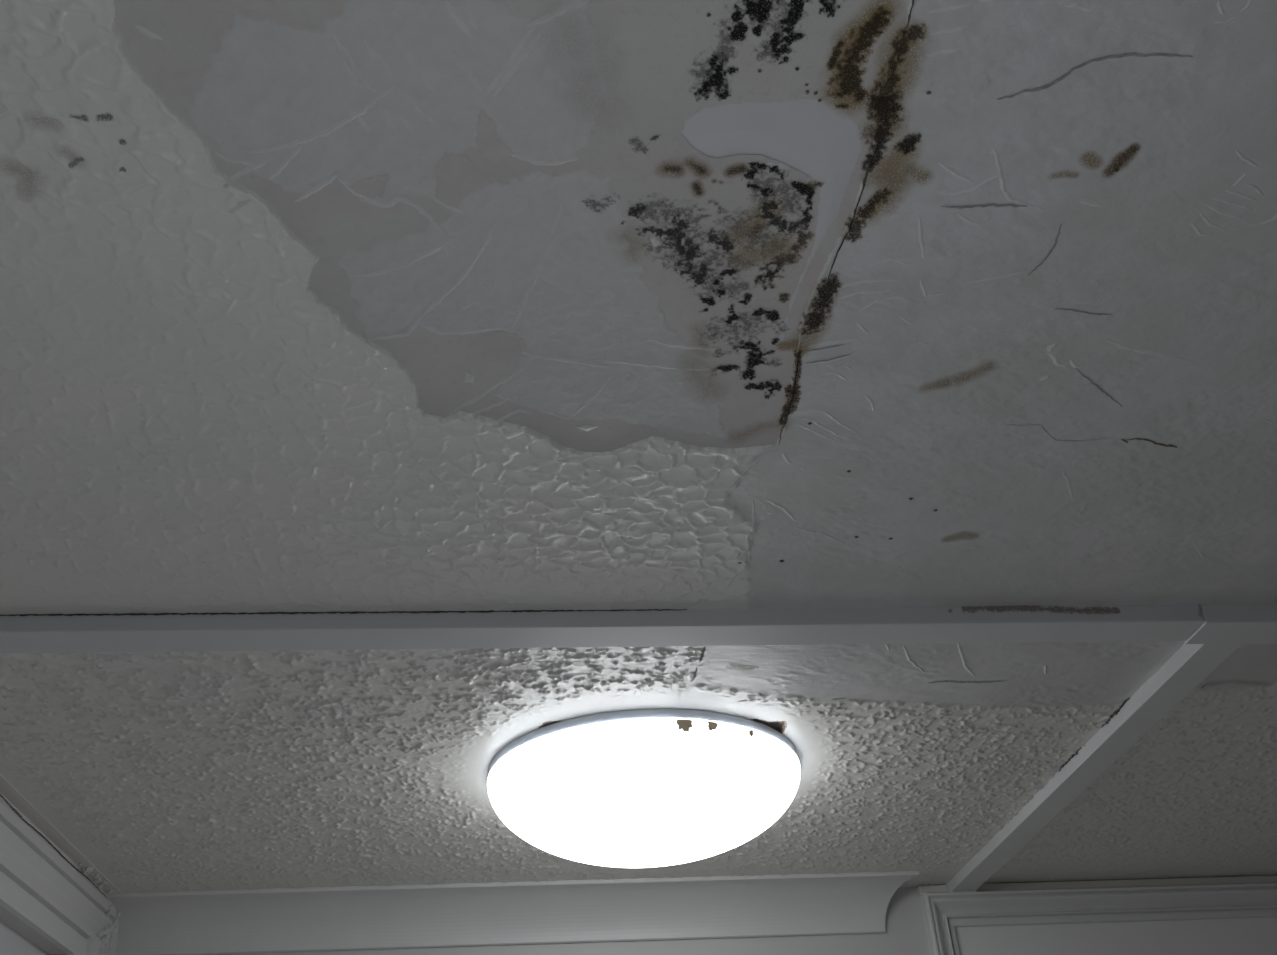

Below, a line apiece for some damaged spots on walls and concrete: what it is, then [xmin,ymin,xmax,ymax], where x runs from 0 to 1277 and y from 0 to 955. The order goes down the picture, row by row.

leakage [690,0,840,101]
crack [894,0,914,68]
leakage [805,0,928,242]
peeling [114,0,910,452]
leakage [622,162,815,399]
leakage [800,274,841,335]
crack [828,140,881,280]
crack [779,342,851,444]